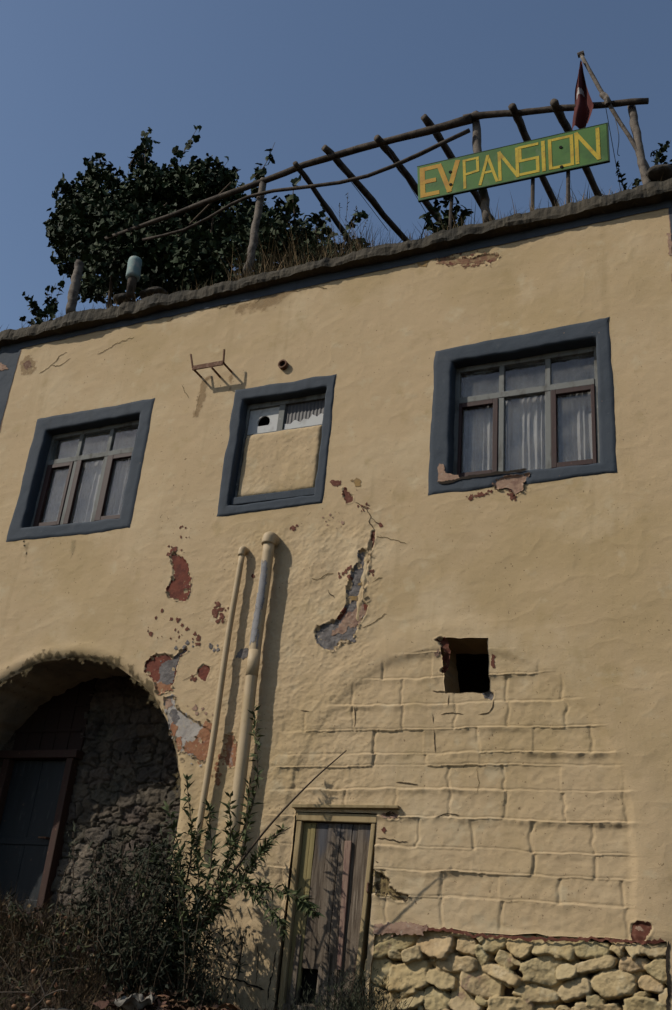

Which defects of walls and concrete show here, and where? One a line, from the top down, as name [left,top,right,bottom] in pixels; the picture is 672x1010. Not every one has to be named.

peeling [417,251,501,268]
flaking render [437,463,459,482]
flaking render [466,472,530,501]
crack [308,478,406,544]
peeling [165,525,191,601]
peeling [212,601,229,623]
peeling [236,560,267,659]
flaking render [314,531,375,653]
peeling [144,608,237,786]
flaking render [372,861,410,901]
flaking render [372,920,665,945]